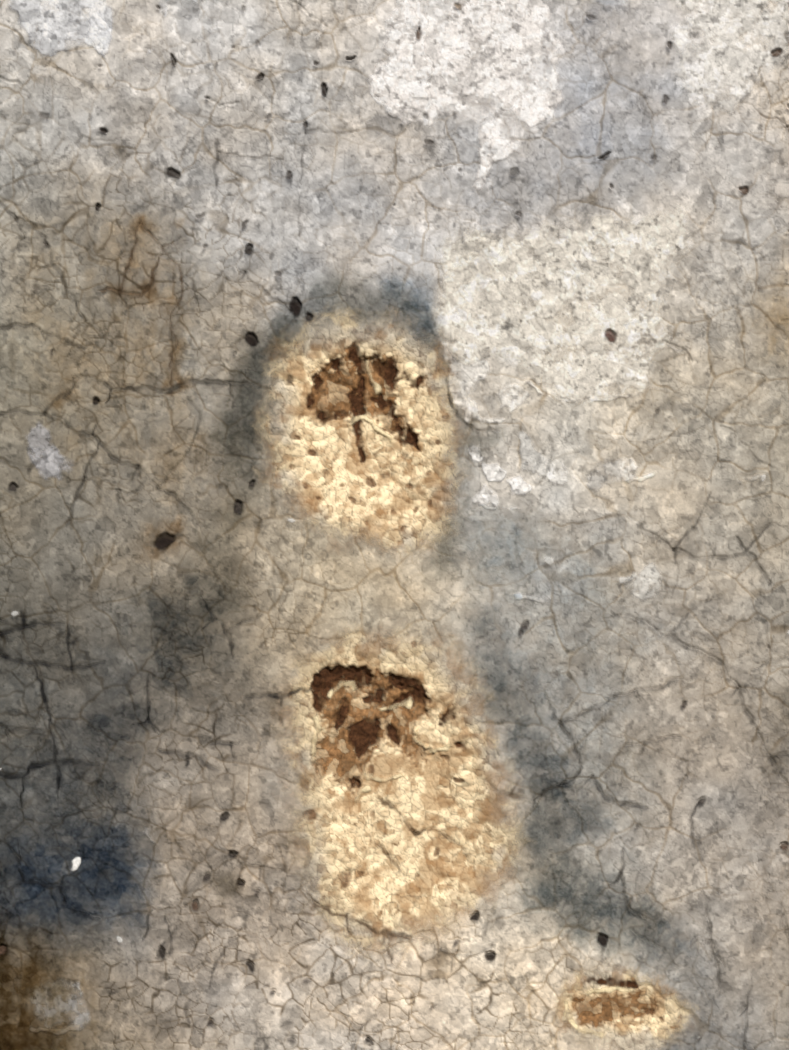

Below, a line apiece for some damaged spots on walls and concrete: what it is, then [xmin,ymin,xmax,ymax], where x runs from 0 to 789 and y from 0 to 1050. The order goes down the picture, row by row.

crack [99,225,182,316]
crack [168,364,260,396]
spalling [265,211,685,548]
crack [0,613,97,719]
crack [246,688,310,699]
crack [0,760,80,801]
crack [133,707,233,769]
spalling [291,632,515,948]
crack [512,719,644,807]
crack [311,897,449,962]
crack [615,867,644,918]
spalling [558,967,688,1050]